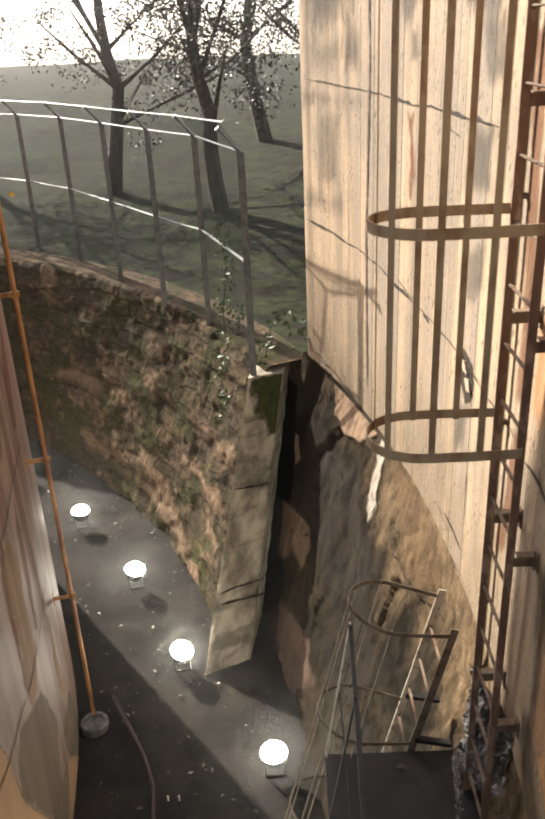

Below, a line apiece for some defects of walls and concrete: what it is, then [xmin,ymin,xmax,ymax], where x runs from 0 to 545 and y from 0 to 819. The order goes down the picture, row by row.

crack [307,0,511,416]
crack [438,477,471,609]
crack [524,462,545,501]
crack [0,578,46,790]